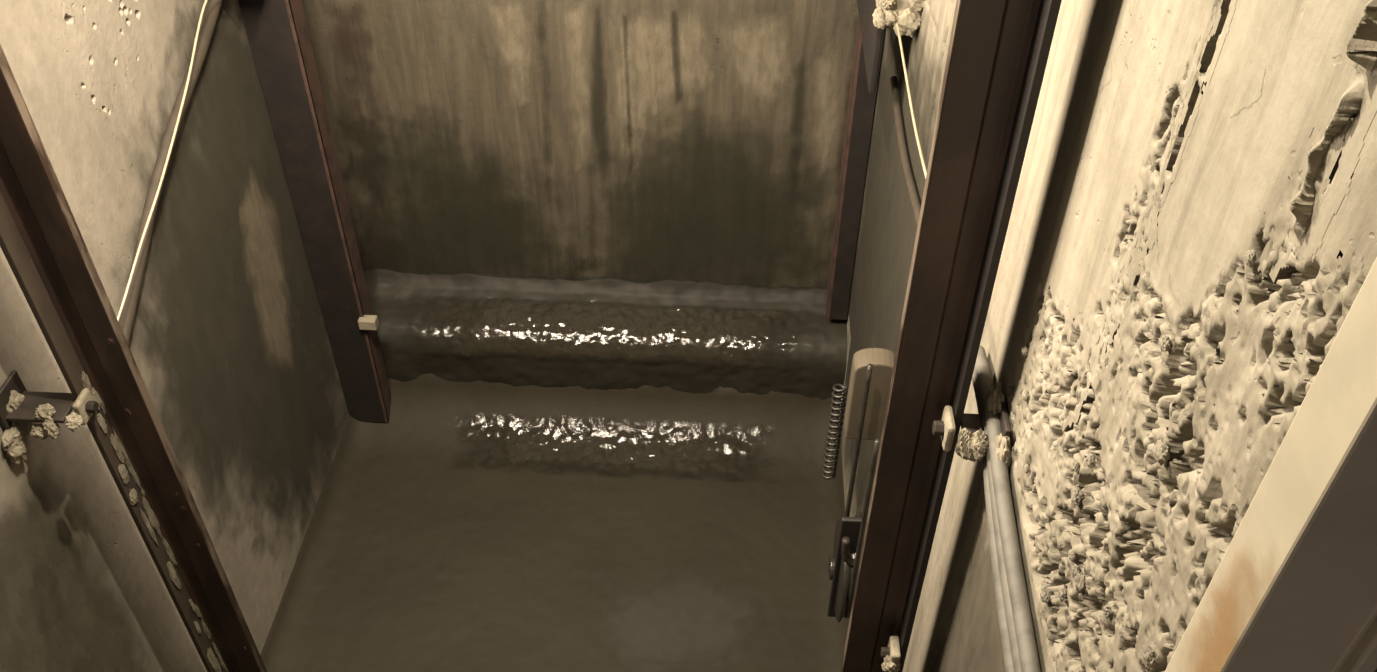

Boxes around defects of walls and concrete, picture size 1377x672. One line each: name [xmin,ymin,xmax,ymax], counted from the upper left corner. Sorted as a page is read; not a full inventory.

leakage [367,136,574,281]
leakage [491,5,530,104]
leakage [565,5,820,288]
leakage [815,59,837,172]
spalling [1004,0,1377,672]